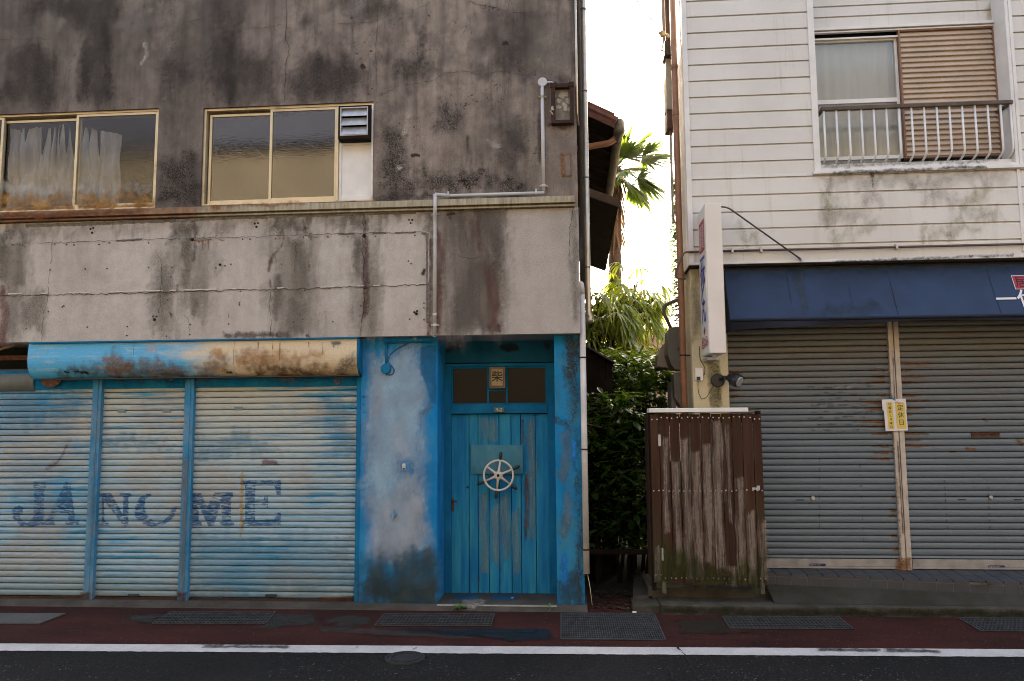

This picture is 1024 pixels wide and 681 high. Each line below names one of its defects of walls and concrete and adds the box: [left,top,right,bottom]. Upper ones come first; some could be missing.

leakage [376,128,526,201]
leakage [496,114,541,166]
leakage [443,209,506,333]
corrosion [40,354,184,387]
corrosion [237,342,354,383]
leakage [361,549,438,604]